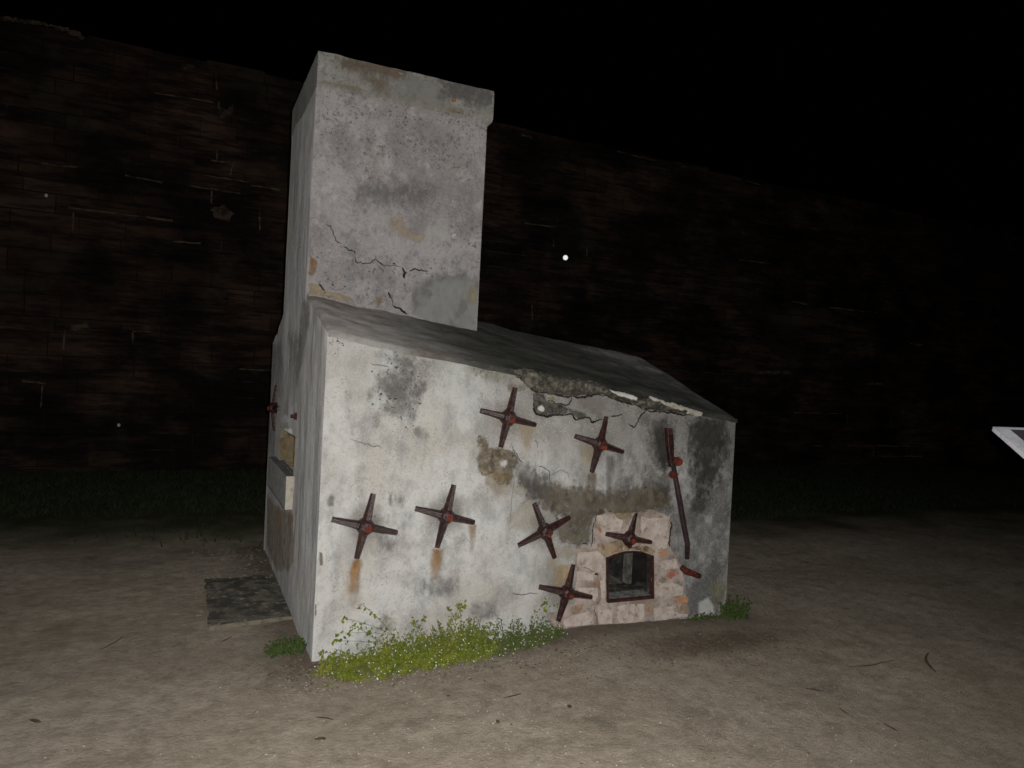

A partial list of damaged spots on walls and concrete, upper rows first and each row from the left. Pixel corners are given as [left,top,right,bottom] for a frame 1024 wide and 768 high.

crack [319,225,427,314]
spalling [511,368,702,418]
damp [515,416,674,546]
crack [510,389,693,523]
damp [688,416,727,510]
corrosion [351,559,360,584]
corrosion [432,550,441,570]